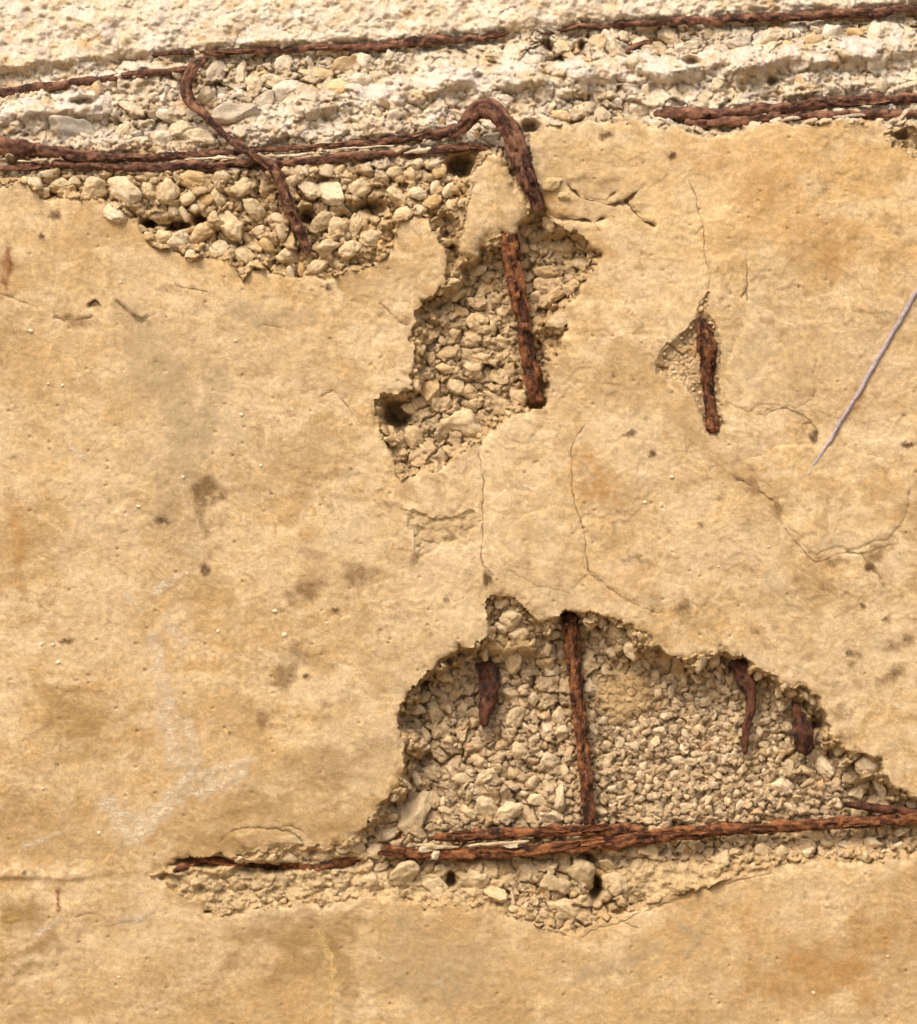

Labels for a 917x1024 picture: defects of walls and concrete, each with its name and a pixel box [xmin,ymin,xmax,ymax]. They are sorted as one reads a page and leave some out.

spalling [0,0,917,483]
crack [756,407,818,442]
crack [478,454,492,585]
crack [570,426,654,612]
crack [739,479,888,579]
spalling [149,574,917,936]